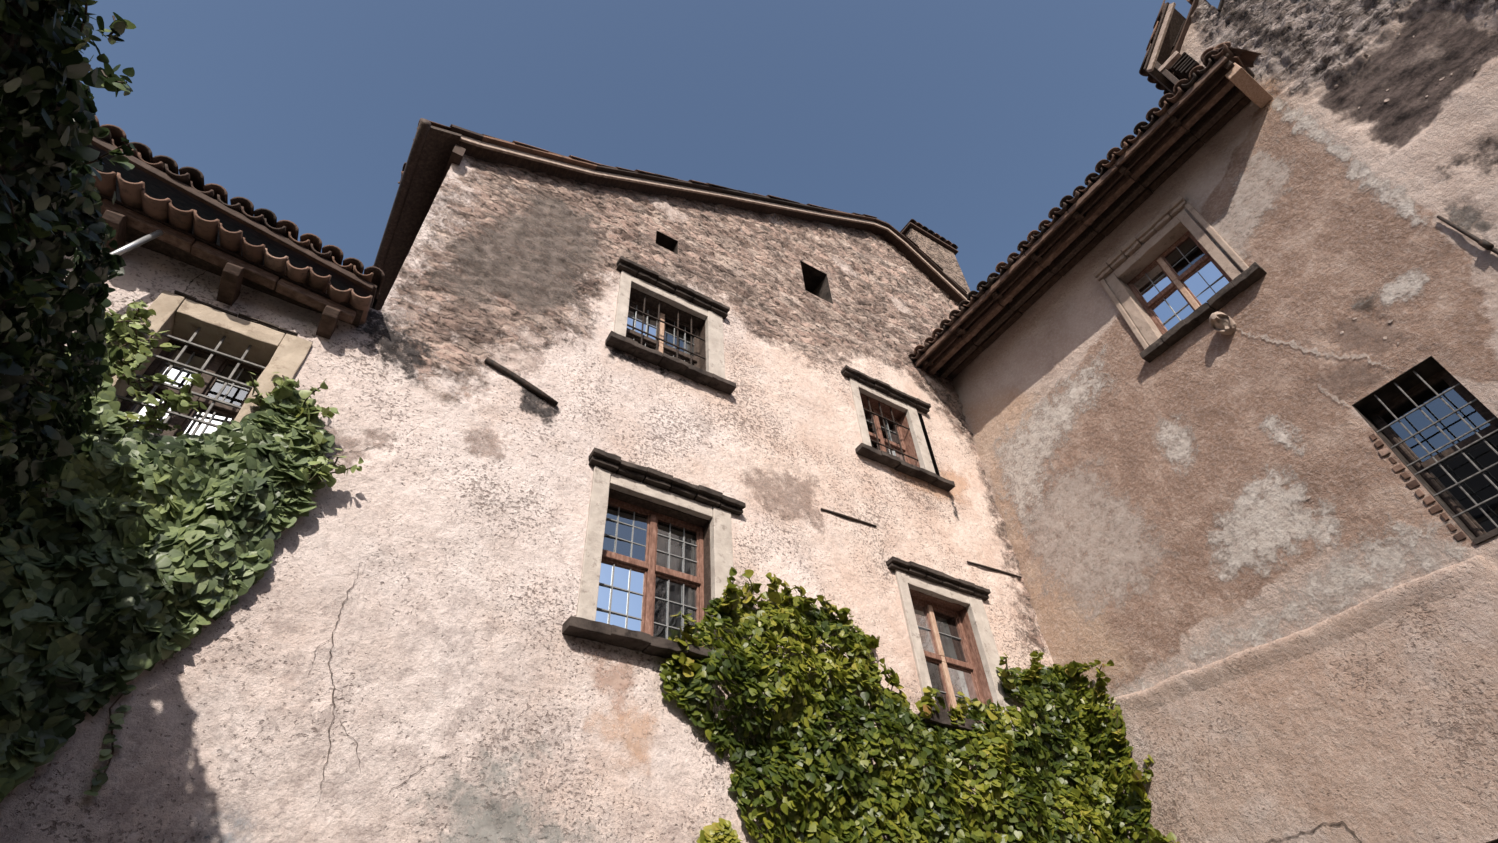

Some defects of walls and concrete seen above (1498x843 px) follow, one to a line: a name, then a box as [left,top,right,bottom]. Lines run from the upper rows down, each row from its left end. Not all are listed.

crack [308,563,360,807]
crack [385,750,459,797]
crack [1265,821,1362,843]